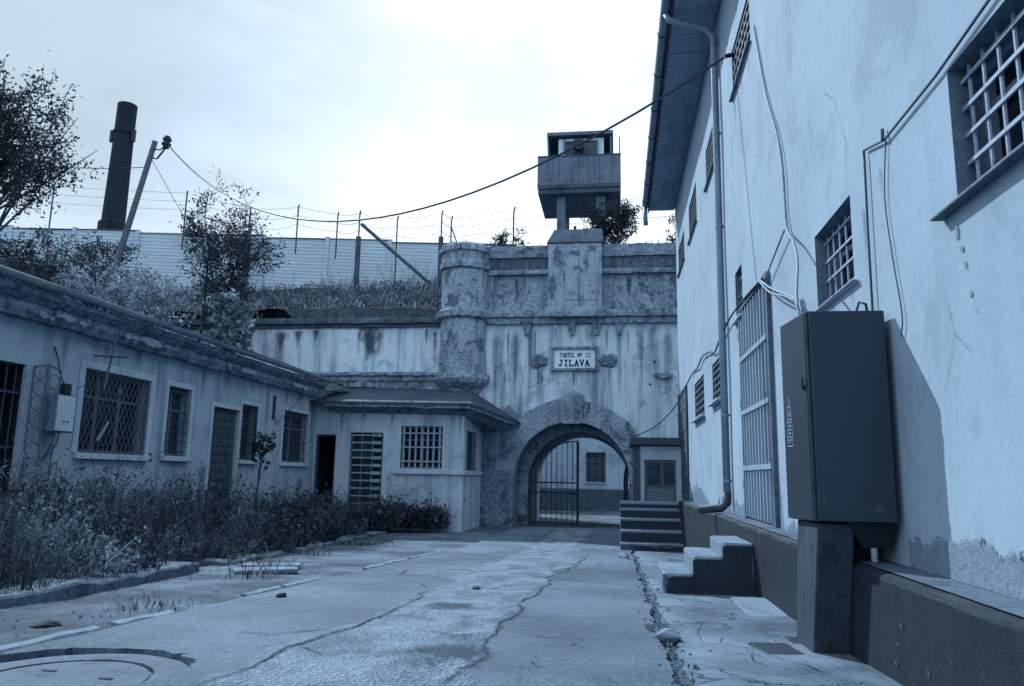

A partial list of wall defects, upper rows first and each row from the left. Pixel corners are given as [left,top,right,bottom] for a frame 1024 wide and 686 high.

water stain [359,327,381,354]
crack [195,569,469,685]
crack [422,554,602,680]
flaking render [908,535,1024,601]